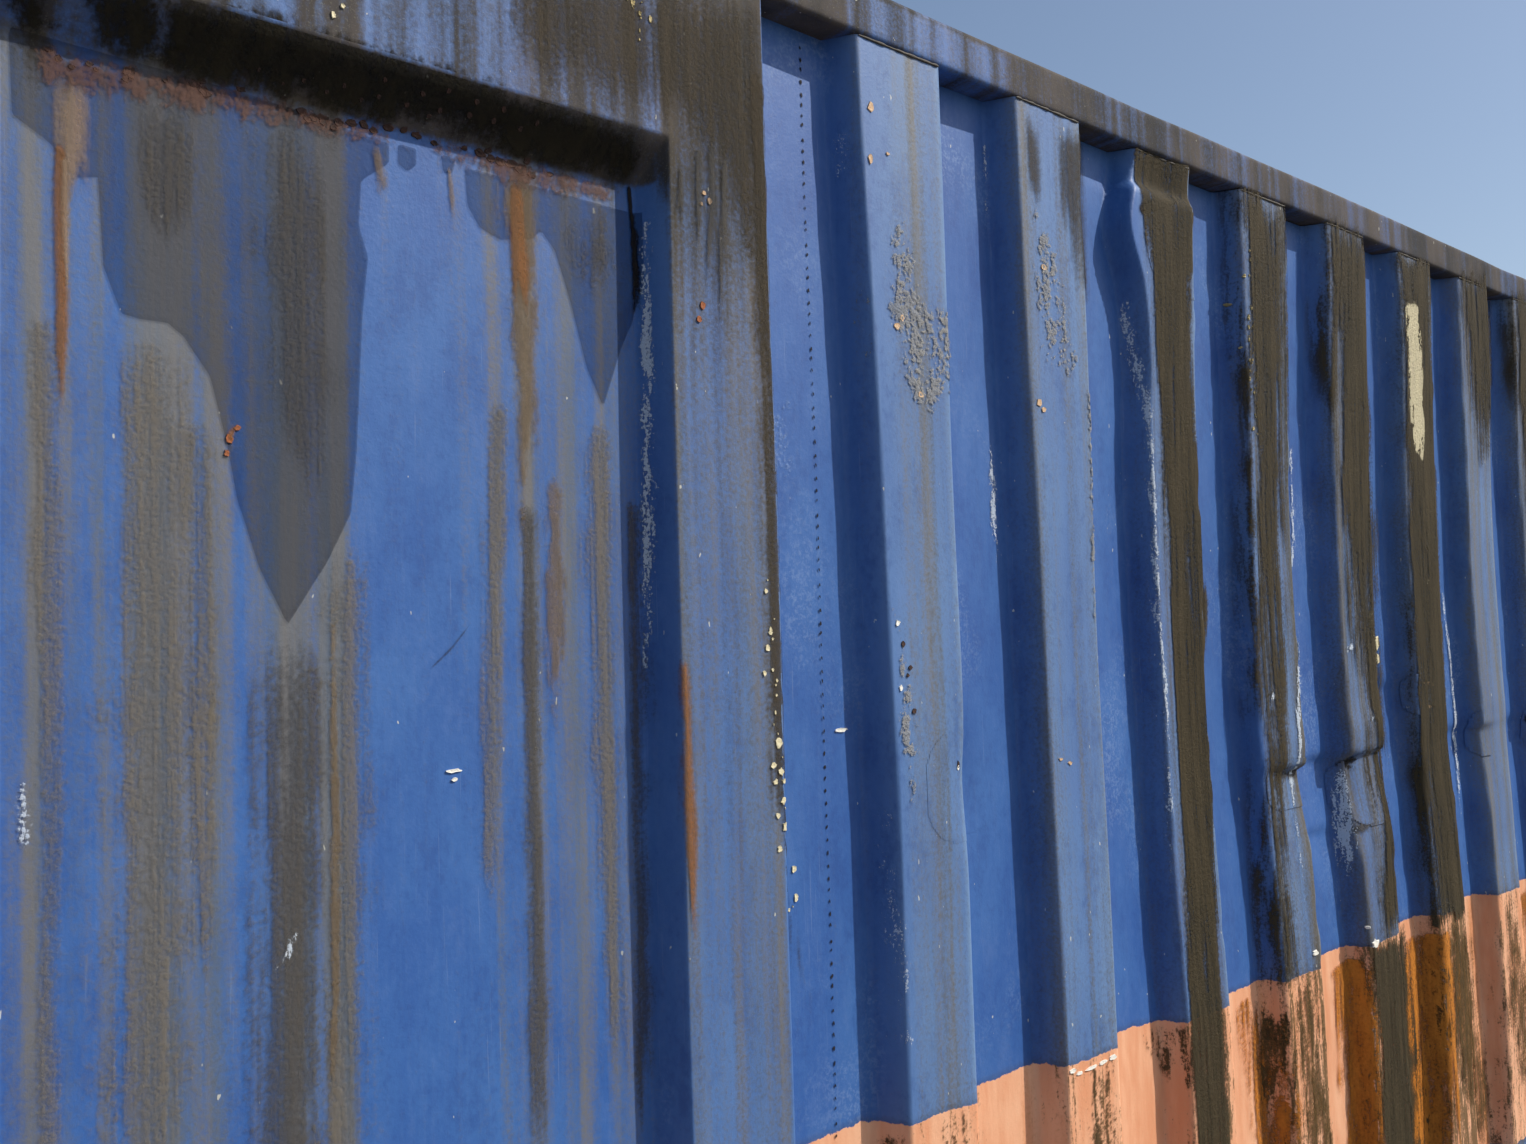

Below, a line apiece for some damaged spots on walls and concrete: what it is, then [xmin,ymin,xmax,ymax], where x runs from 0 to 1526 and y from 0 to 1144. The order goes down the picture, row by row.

rust [39,47,609,483]
damp [88,0,640,310]
peeling [1405,303,1425,460]
rust [681,663,698,909]
damp [1134,148,1231,1144]
damp [1226,186,1300,988]
damp [1312,218,1430,1144]
damp [1396,253,1465,928]
peeling [1070,1054,1117,1076]
rust [1237,998,1303,1144]
rust [1332,959,1385,1144]
rust [1406,914,1507,1144]